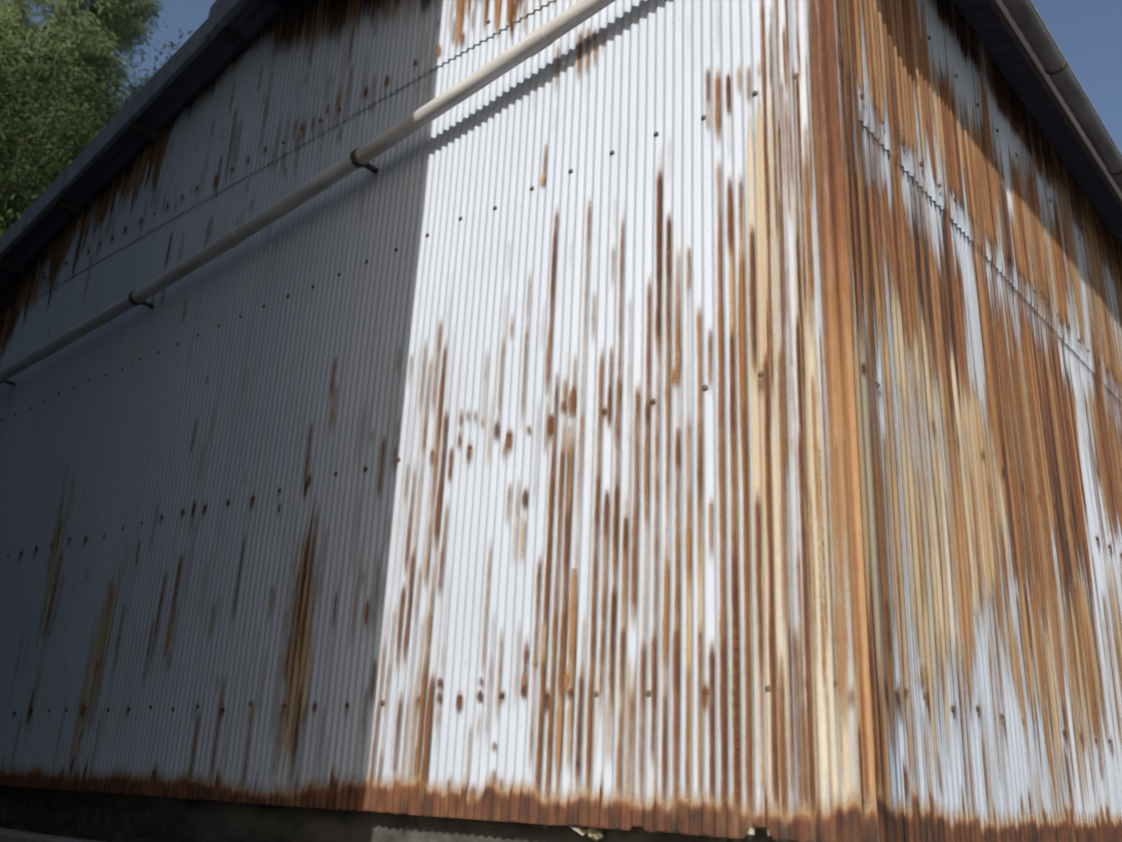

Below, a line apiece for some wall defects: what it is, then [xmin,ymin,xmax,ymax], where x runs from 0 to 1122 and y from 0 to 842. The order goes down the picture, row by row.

rust [435,0,525,57]
rust [706,67,751,135]
rust [0,127,196,360]
rust [274,500,318,781]
rust [390,324,447,663]
rust [494,322,513,453]
rust [532,560,541,665]
rust [545,212,558,389]
rust [599,225,624,703]
rust [631,389,640,615]
rust [645,172,680,519]
rust [668,424,691,466]